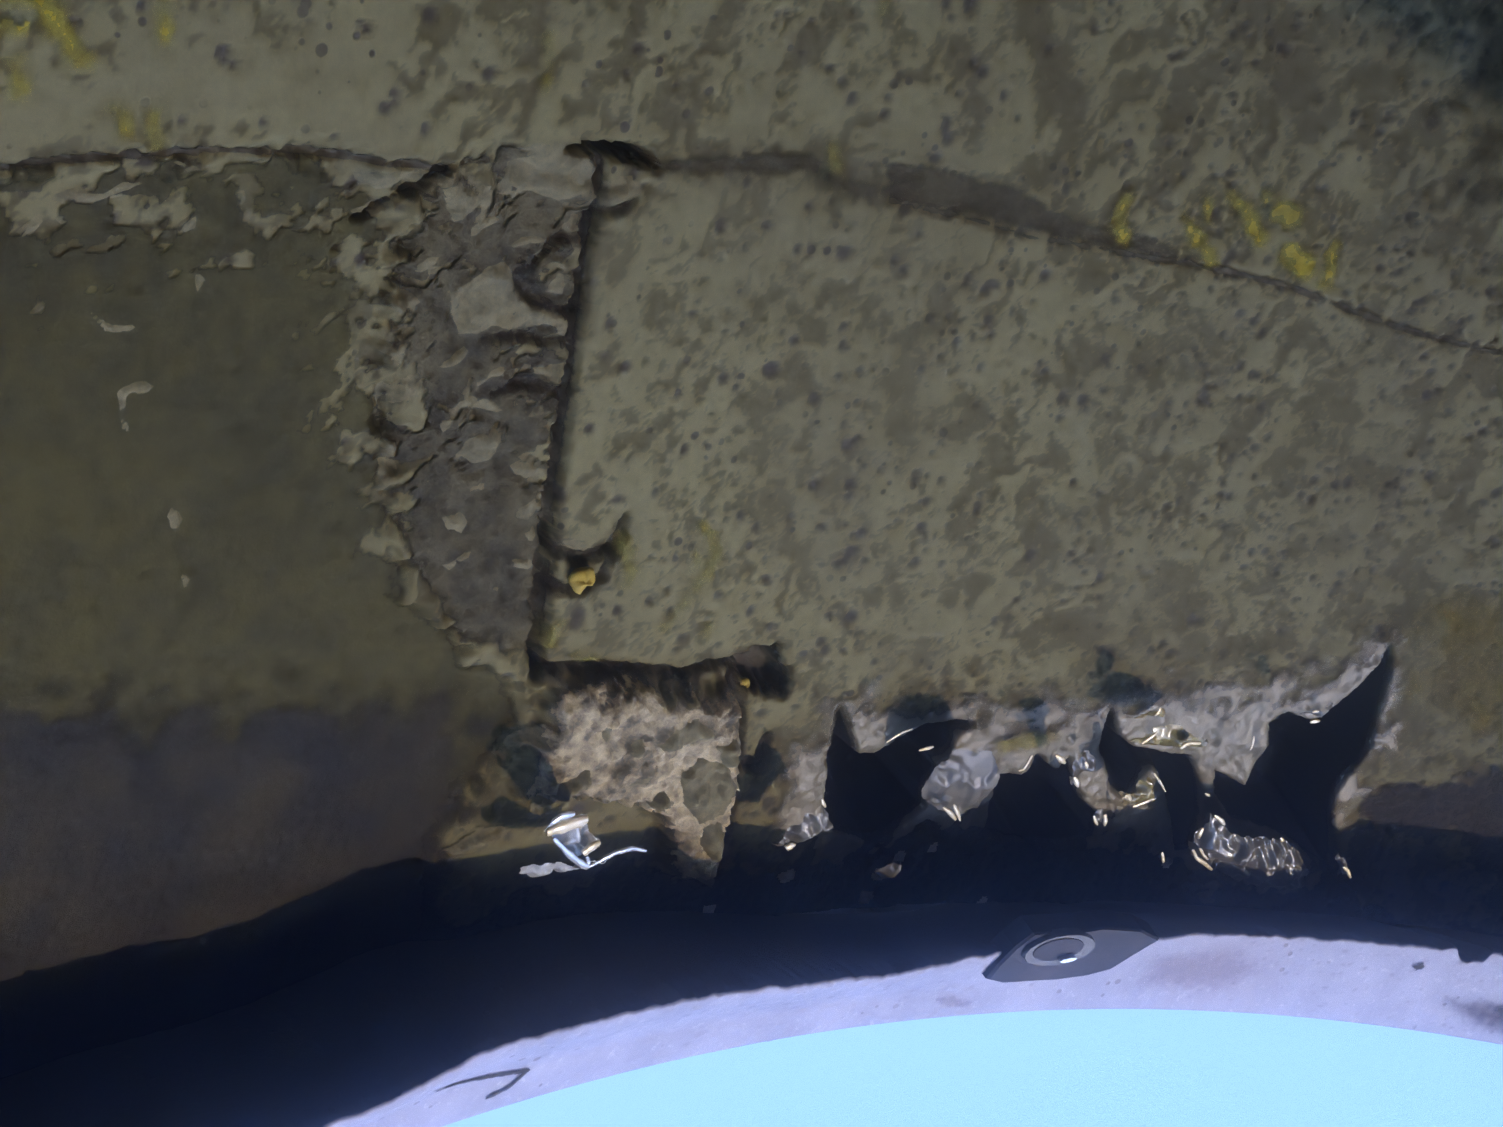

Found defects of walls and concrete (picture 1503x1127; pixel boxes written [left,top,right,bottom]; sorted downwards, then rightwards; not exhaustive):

crack [0,144,448,217]
crack [481,139,1503,770]
spalling [524,642,788,888]